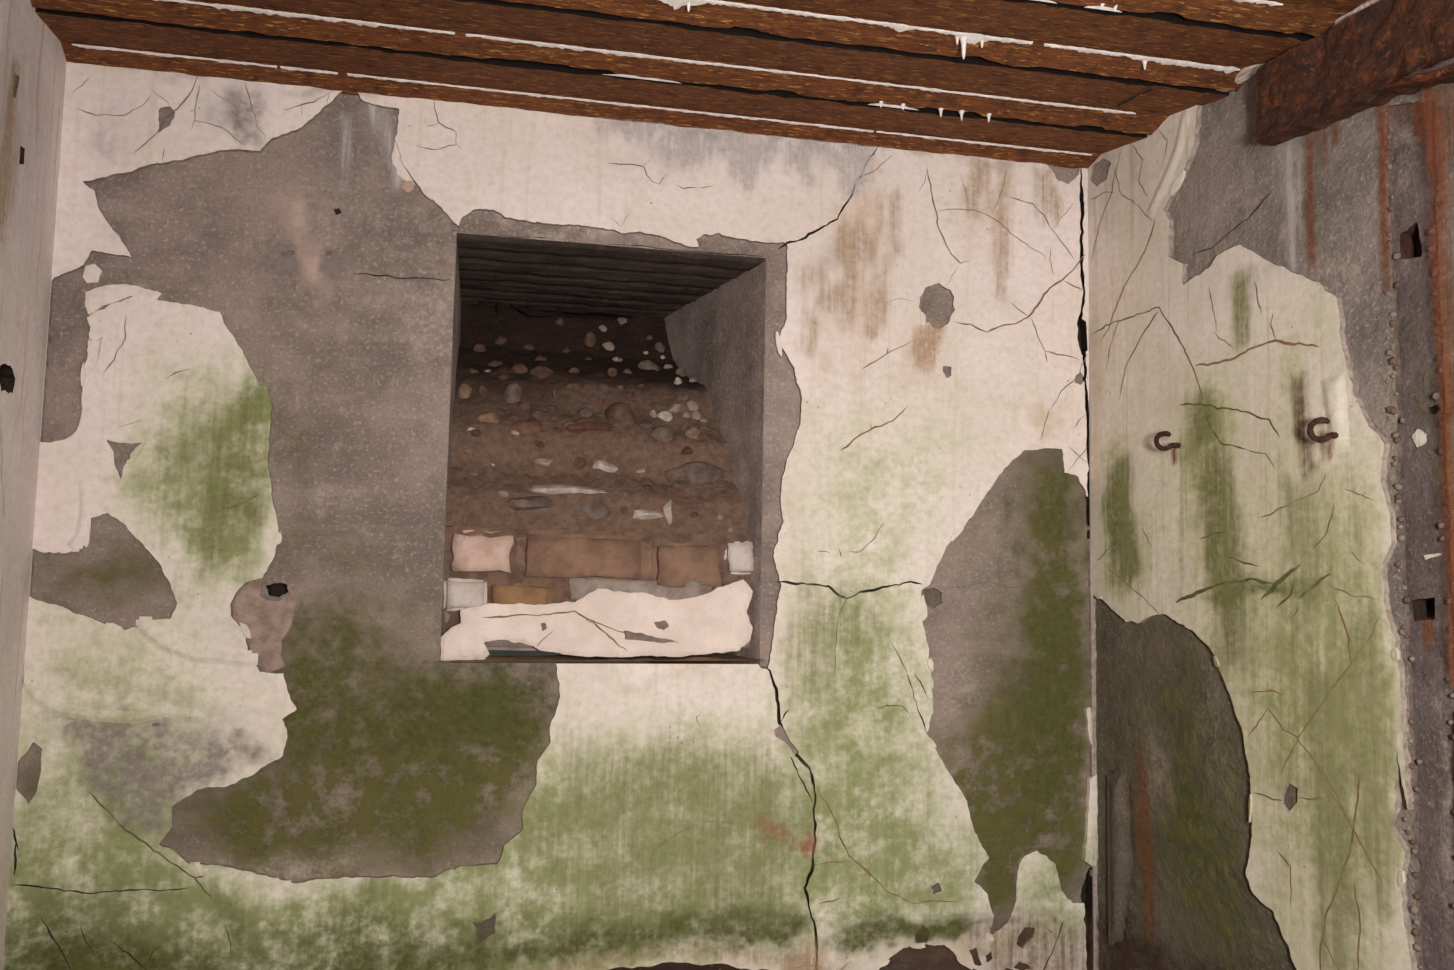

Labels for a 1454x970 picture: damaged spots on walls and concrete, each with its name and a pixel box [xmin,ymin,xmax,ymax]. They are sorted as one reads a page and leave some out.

damp [72,44,1092,192]
damp [154,0,1136,123]
damp [660,0,1240,74]
spalling [0,363,15,393]
spalling [30,92,802,883]
crack [761,666,959,970]
crack [777,524,1072,676]
spalling [879,448,1296,970]
crack [920,132,1383,970]
spalling [1163,56,1454,970]
rust [1295,379,1330,470]
rust [1378,89,1454,686]